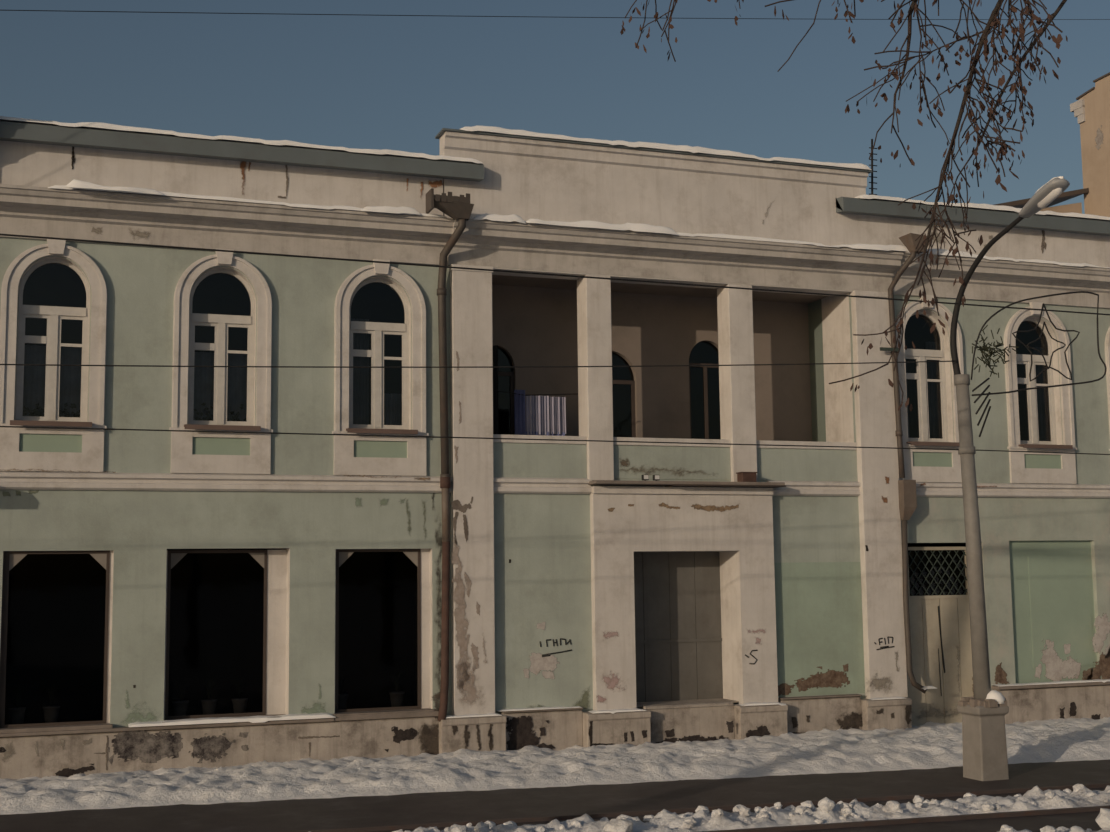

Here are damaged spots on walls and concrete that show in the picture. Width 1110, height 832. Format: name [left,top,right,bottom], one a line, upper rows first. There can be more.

corrosion [240,161,251,194]
peeling [452,540,480,696]
spalling [778,664,850,696]
peeling [1034,613,1110,681]